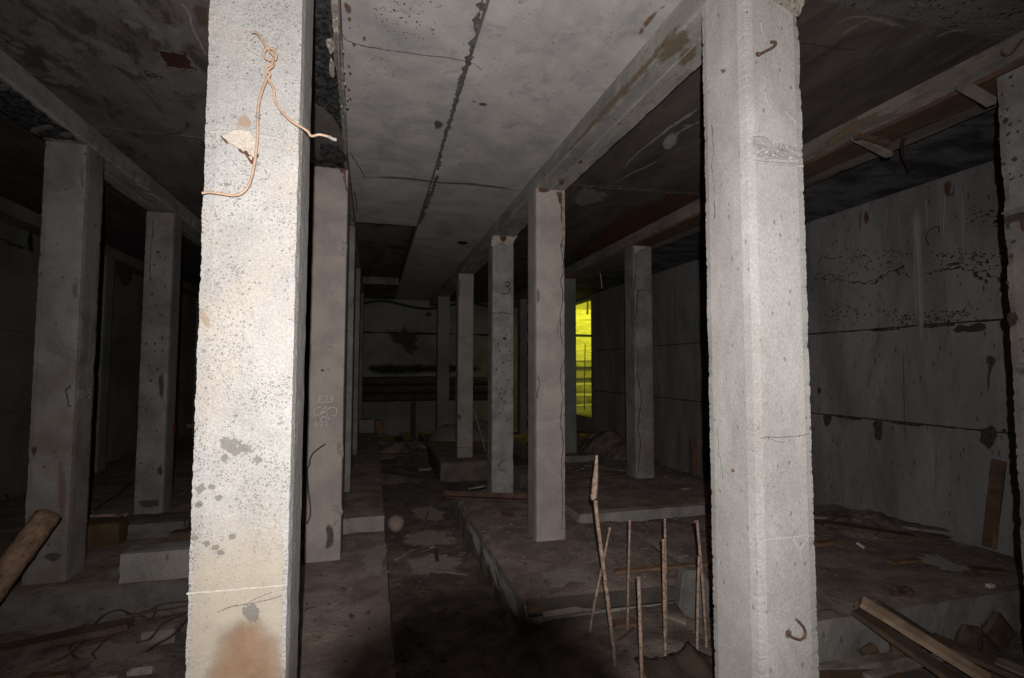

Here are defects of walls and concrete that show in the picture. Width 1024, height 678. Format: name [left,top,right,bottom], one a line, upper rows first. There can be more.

crack [342,33,481,69]
spalling [217,114,260,166]
rust [215,627,273,678]